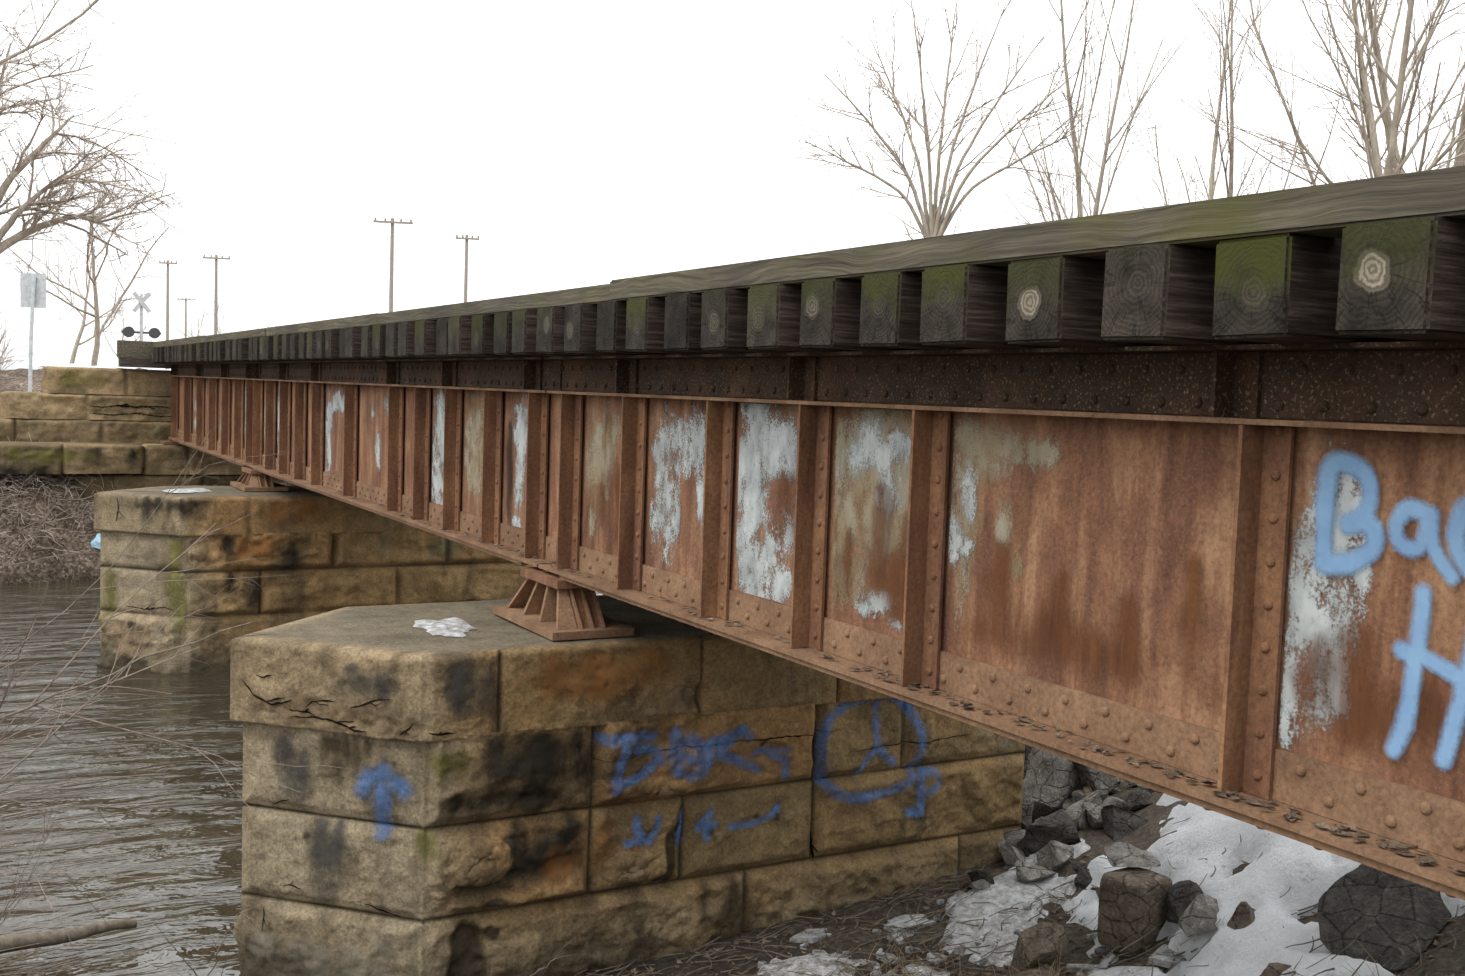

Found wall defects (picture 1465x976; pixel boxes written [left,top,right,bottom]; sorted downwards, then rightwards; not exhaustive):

crack [243,675,454,736]
peeling [649,402,706,564]
peeling [735,403,798,603]
peeling [832,409,912,633]
rust [873,484,908,620]
peeling [1279,473,1373,749]